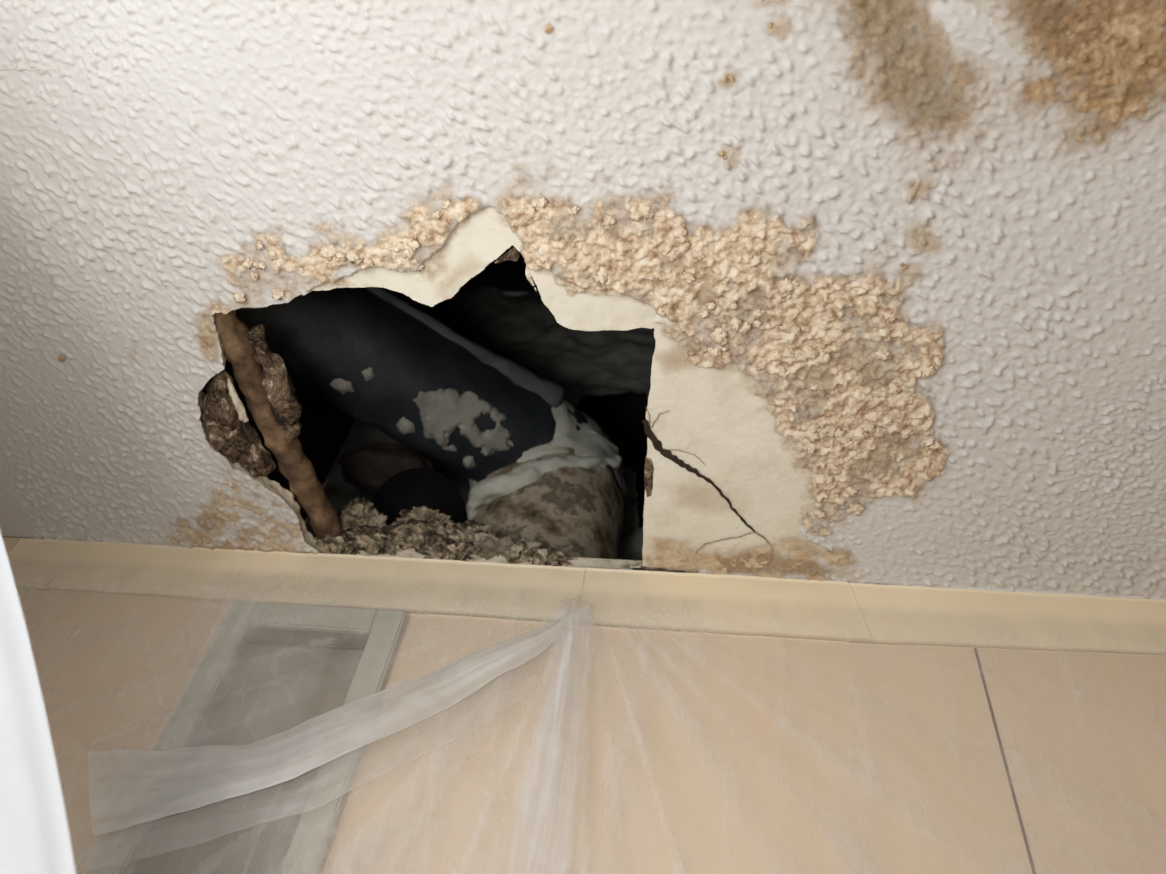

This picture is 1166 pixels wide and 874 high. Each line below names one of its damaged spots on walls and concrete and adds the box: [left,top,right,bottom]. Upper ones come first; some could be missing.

water stain [851,0,973,130]
water stain [1022,0,1166,144]
spalling [198,207,828,574]
crack [640,408,773,572]